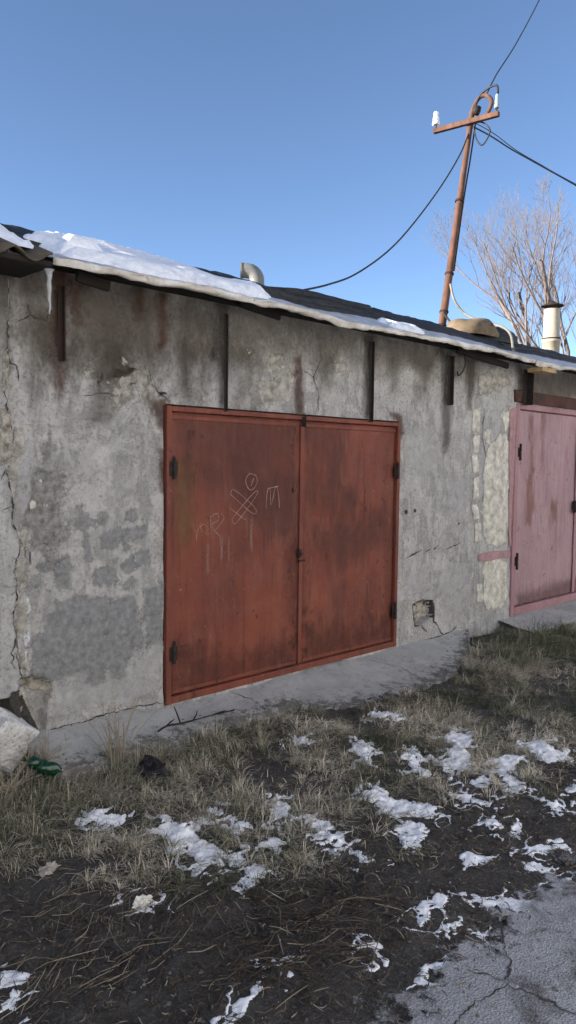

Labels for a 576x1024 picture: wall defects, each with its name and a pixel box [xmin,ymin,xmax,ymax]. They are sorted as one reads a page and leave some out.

crack [2,276,65,691]
crack [84,371,169,401]
peeling [472,406,511,612]
spalling [18,675,54,712]